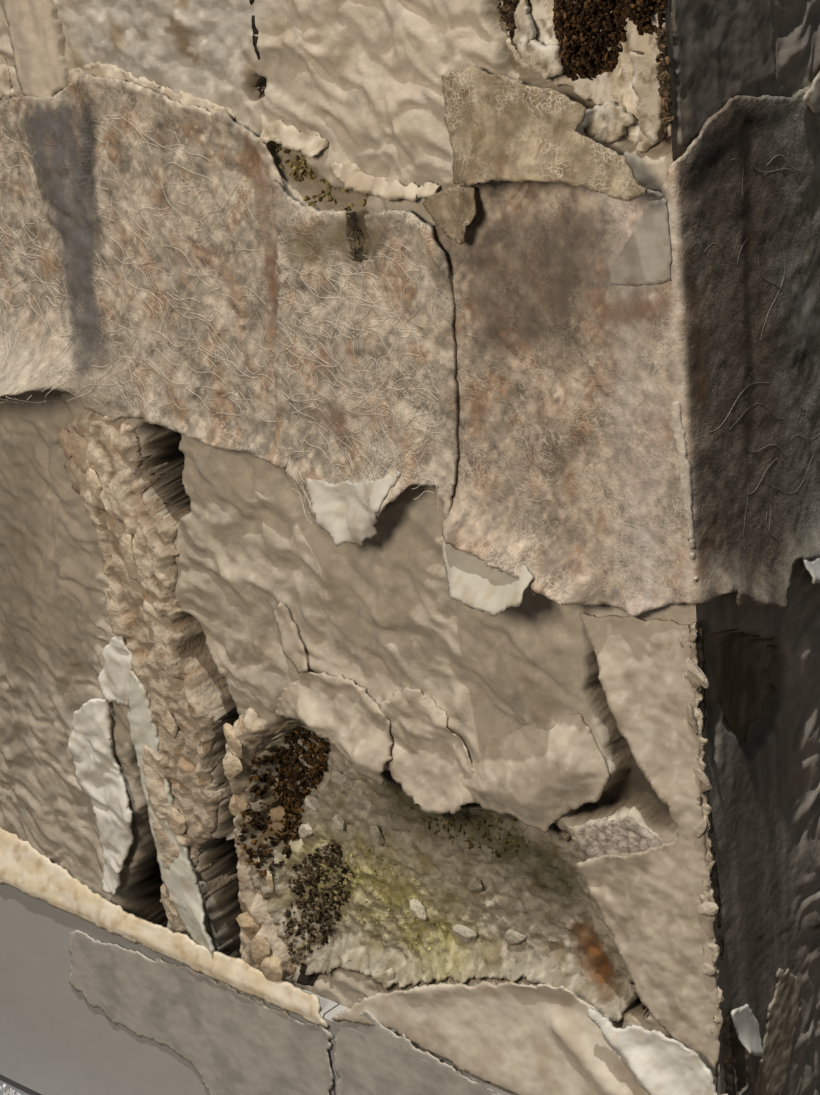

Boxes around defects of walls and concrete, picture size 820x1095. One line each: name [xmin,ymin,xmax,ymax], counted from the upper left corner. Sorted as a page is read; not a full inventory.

crack [249,0,267,98]
flaking render [505,0,671,152]
peeling [803,558,820,585]
crack [216,706,239,724]
spalling [58,410,778,1095]
rust [574,925,615,989]